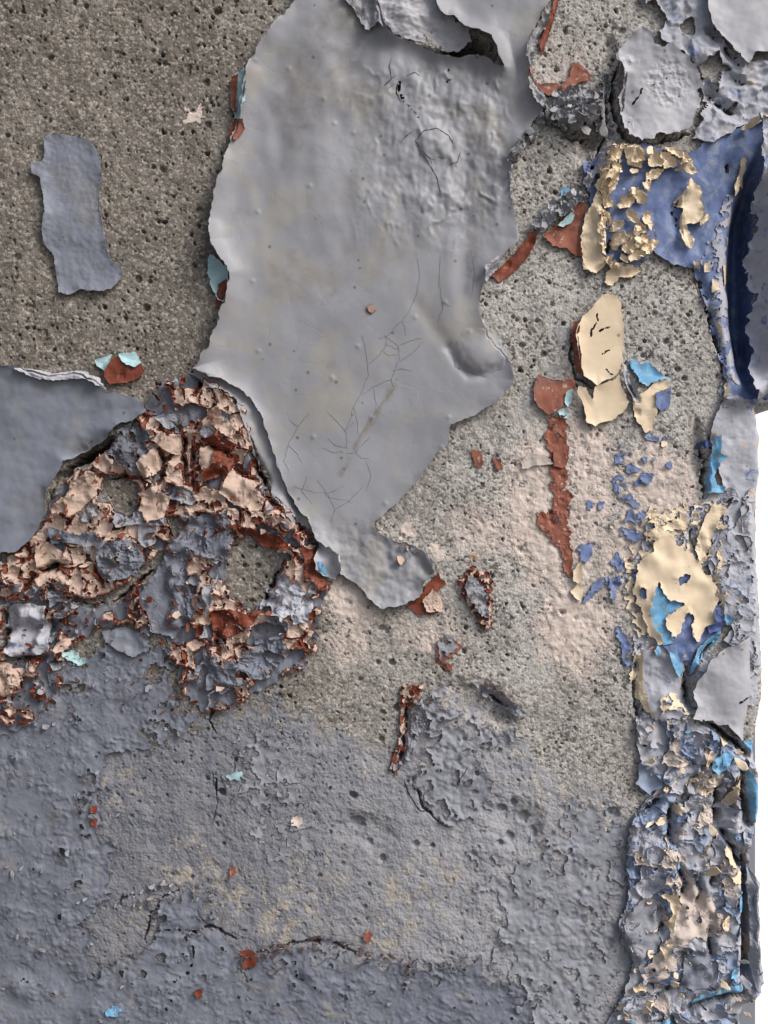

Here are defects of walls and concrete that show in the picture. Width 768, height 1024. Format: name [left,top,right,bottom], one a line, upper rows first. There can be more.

crack [384,61,418,100]
crack [403,128,461,197]
crack [240,253,475,552]
peeling [0,0,768,755]
crack [404,780,449,828]
peeling [533,294,764,1024]